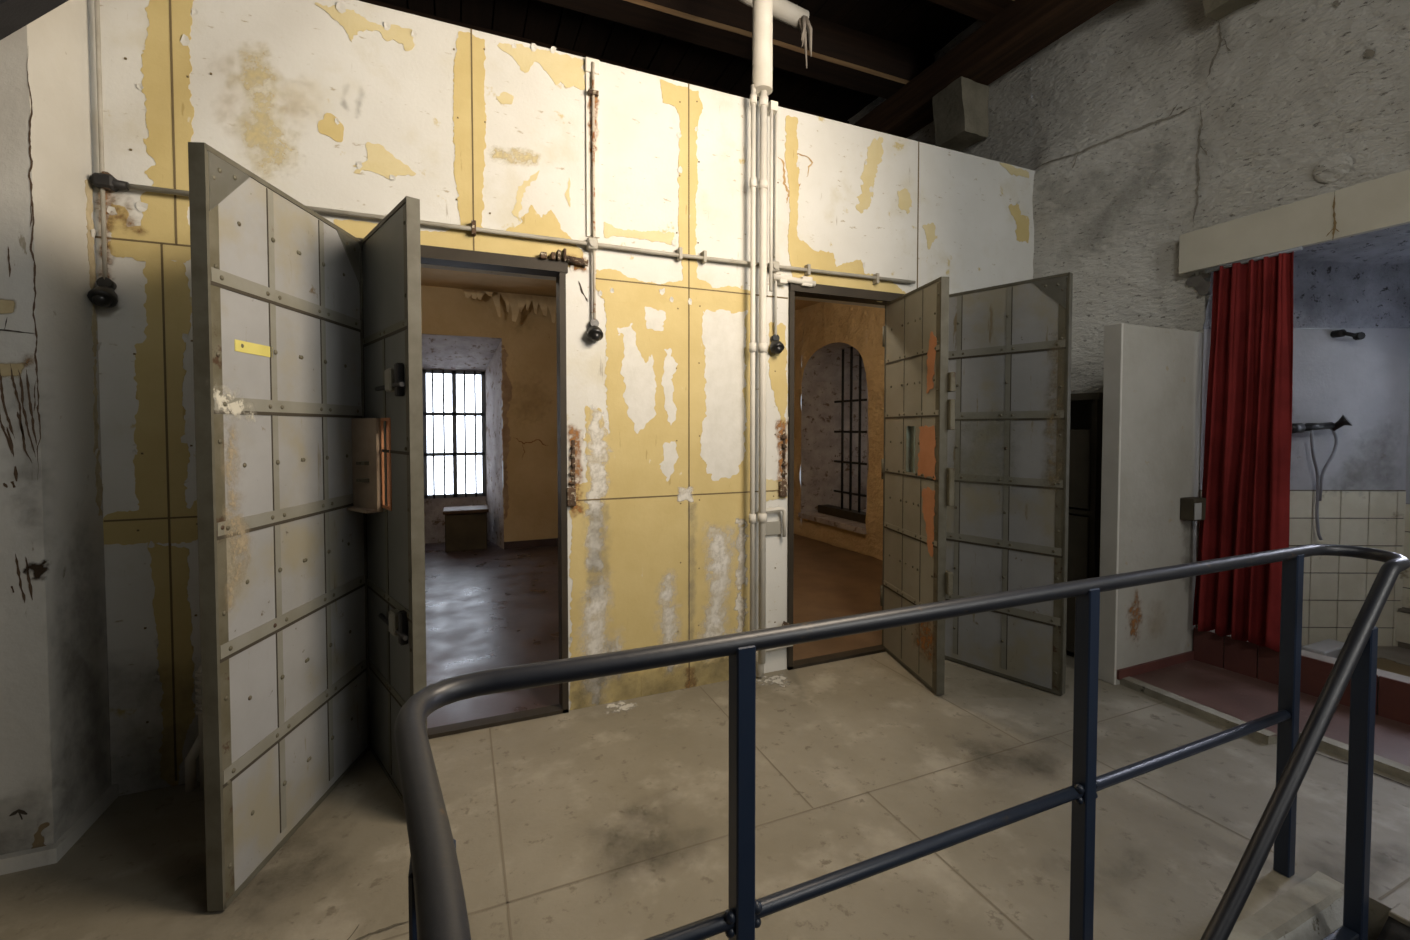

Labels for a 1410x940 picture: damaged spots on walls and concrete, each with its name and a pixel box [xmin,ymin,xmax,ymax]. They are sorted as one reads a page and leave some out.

peeling [315,1,418,51]
peeling [318,113,344,142]
rust [588,96,599,153]
crack [1034,21,1231,225]
peeling [353,142,416,180]
peeling [334,219,378,238]
peeling [420,31,789,658]
rust [0,358,37,488]
rust [10,554,48,603]
rust [1129,592,1142,637]
peeling [569,656,729,710]